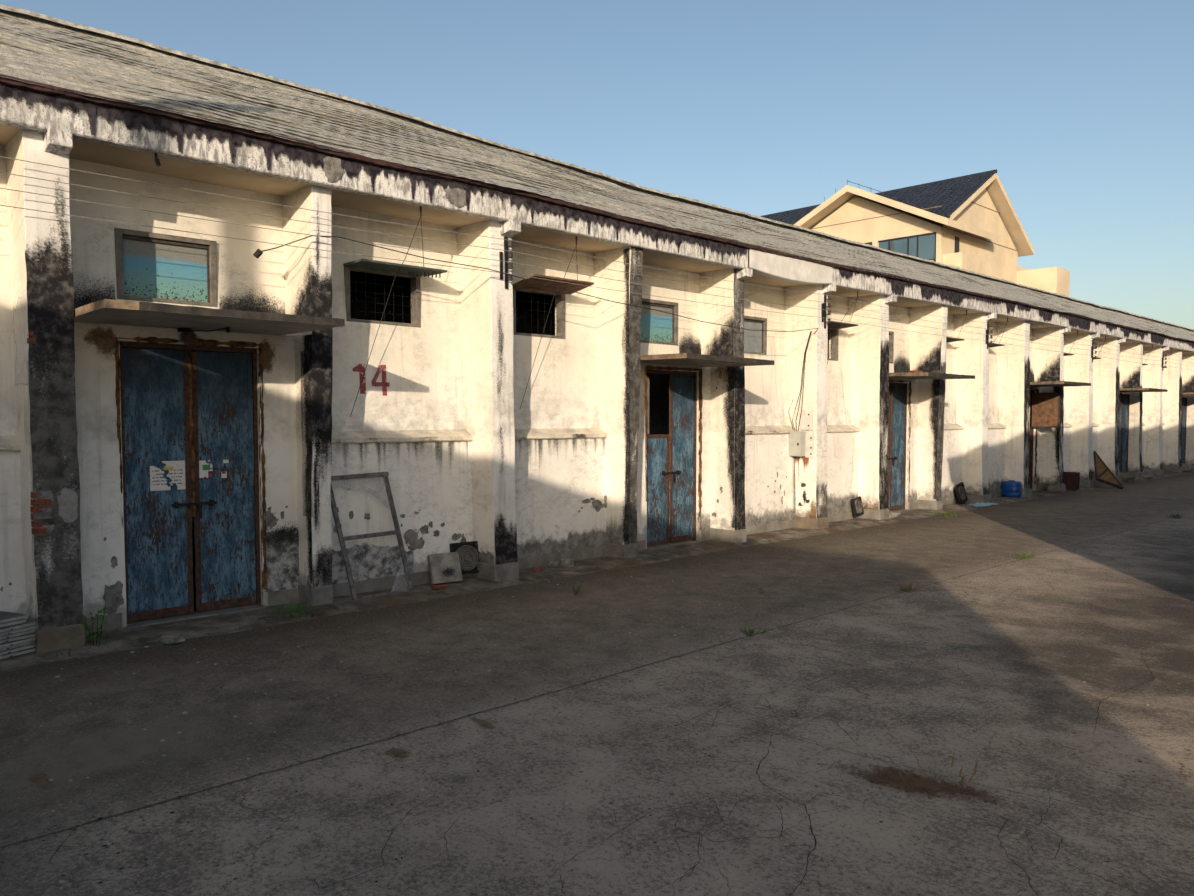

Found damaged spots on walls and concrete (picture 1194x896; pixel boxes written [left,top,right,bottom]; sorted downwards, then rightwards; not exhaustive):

leakage [0,84,1002,630]
flaking render [30,487,78,538]
crack [494,650,1154,896]